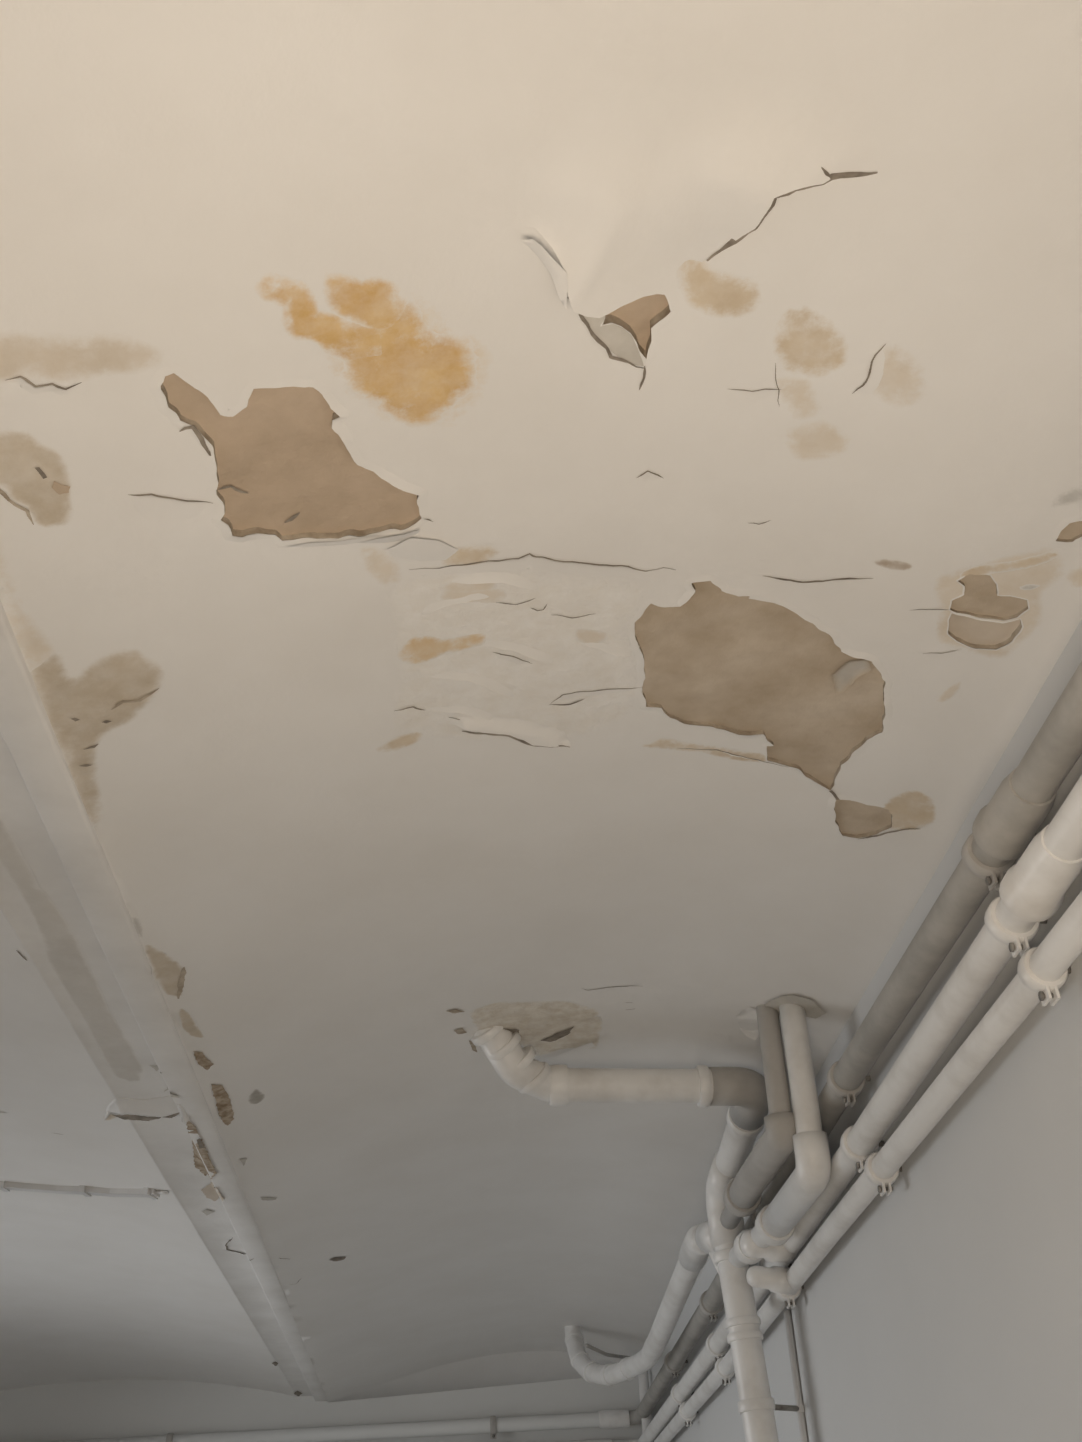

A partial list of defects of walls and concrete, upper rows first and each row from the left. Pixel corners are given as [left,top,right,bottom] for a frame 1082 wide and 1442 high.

water stain [676,260,763,319]
water stain [254,272,494,429]
spalling [579,292,679,390]
crack [637,471,663,482]
crack [409,553,675,619]
spalling [149,365,937,841]
crack [749,576,873,603]
spalling [933,515,1082,659]
water stain [0,535,166,826]